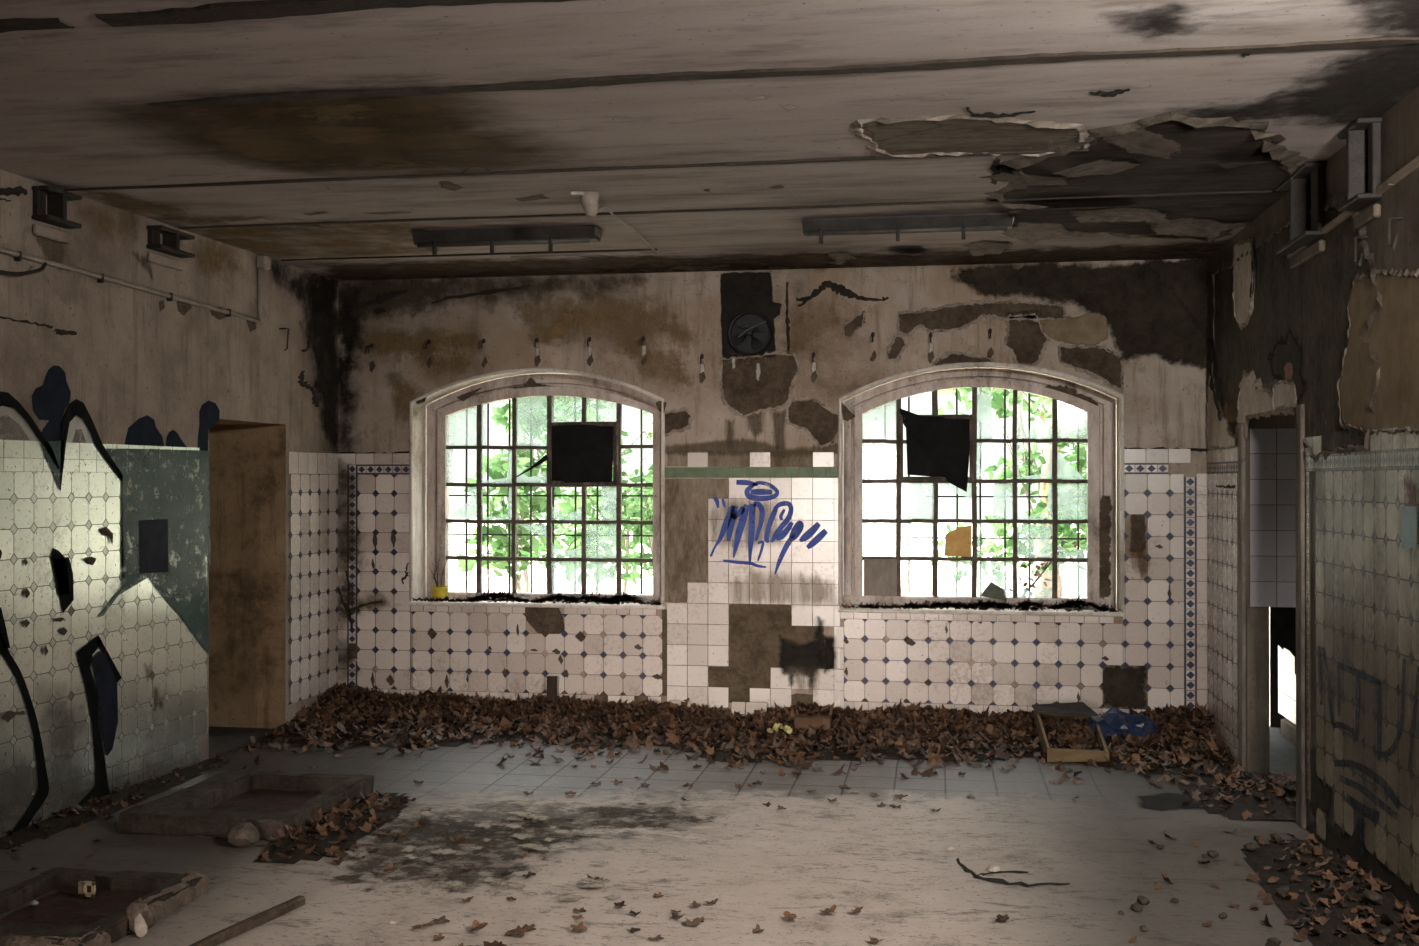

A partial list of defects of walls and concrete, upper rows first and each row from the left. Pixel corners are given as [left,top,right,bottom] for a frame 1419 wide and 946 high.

water stain [1118,4,1186,37]
water stain [1181,0,1419,126]
water stain [129,93,550,173]
water stain [36,236,64,269]
flaking render [850,111,1419,463]
water stain [88,192,1230,617]
flaking render [699,351,855,467]
spalling [371,531,396,569]
peeling [516,401,750,704]
peeling [1099,496,1113,598]
peeling [708,604,848,703]
peeling [791,693,813,706]